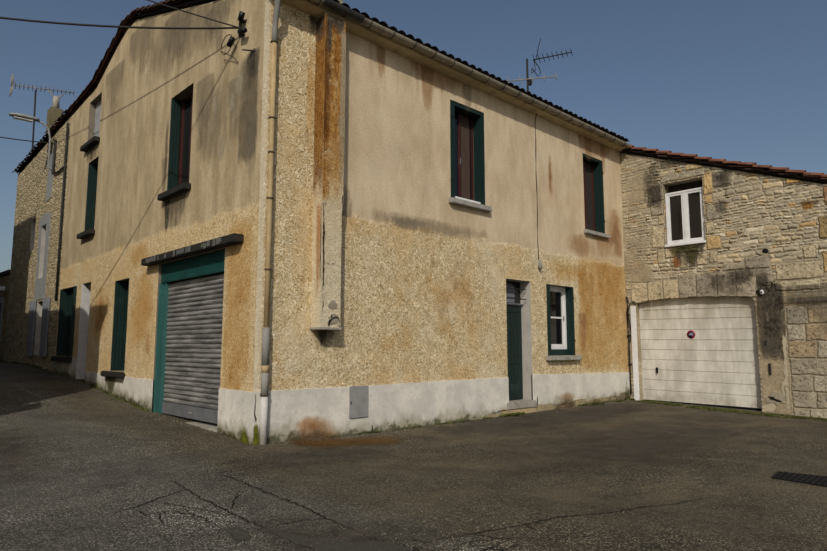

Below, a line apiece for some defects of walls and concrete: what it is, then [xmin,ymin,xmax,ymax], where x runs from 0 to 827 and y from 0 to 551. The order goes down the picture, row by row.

rust [314,16,346,154]
leakage [732,269,790,410]
crack [111,462,384,542]
crack [427,496,712,540]